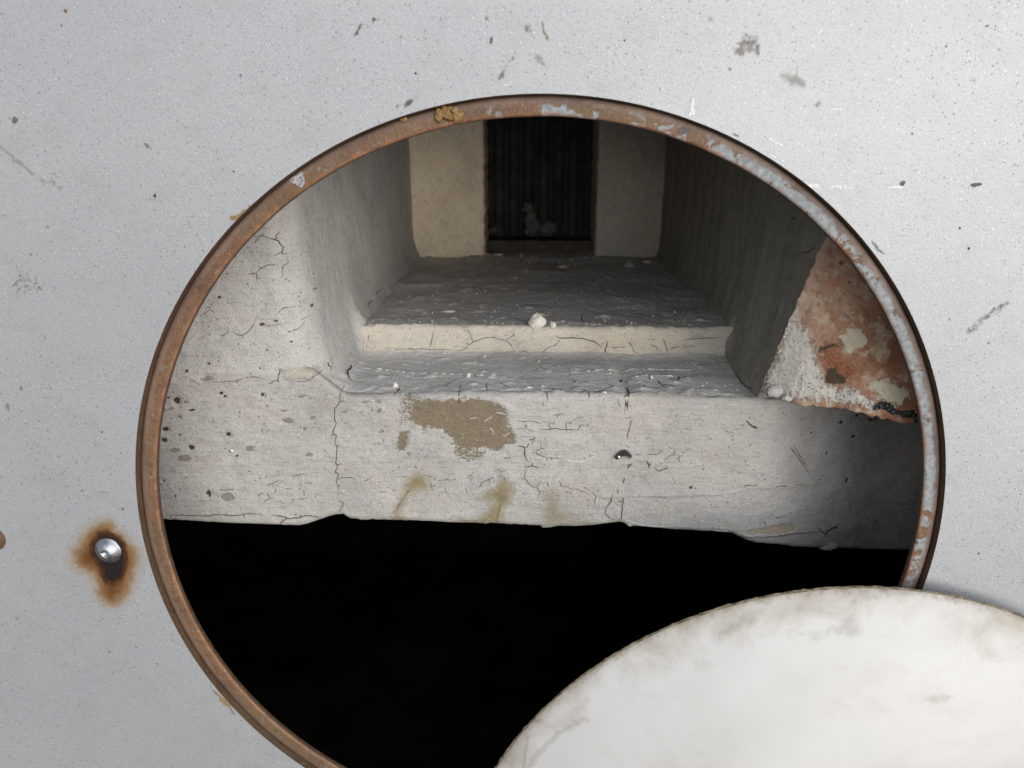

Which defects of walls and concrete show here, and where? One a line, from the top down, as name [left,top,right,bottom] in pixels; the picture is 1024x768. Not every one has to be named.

crack [200,233,316,339]
rust [816,335,862,385]
crack [170,315,720,523]
damp [395,477,427,520]
damp [477,481,511,522]
rust [72,521,138,606]